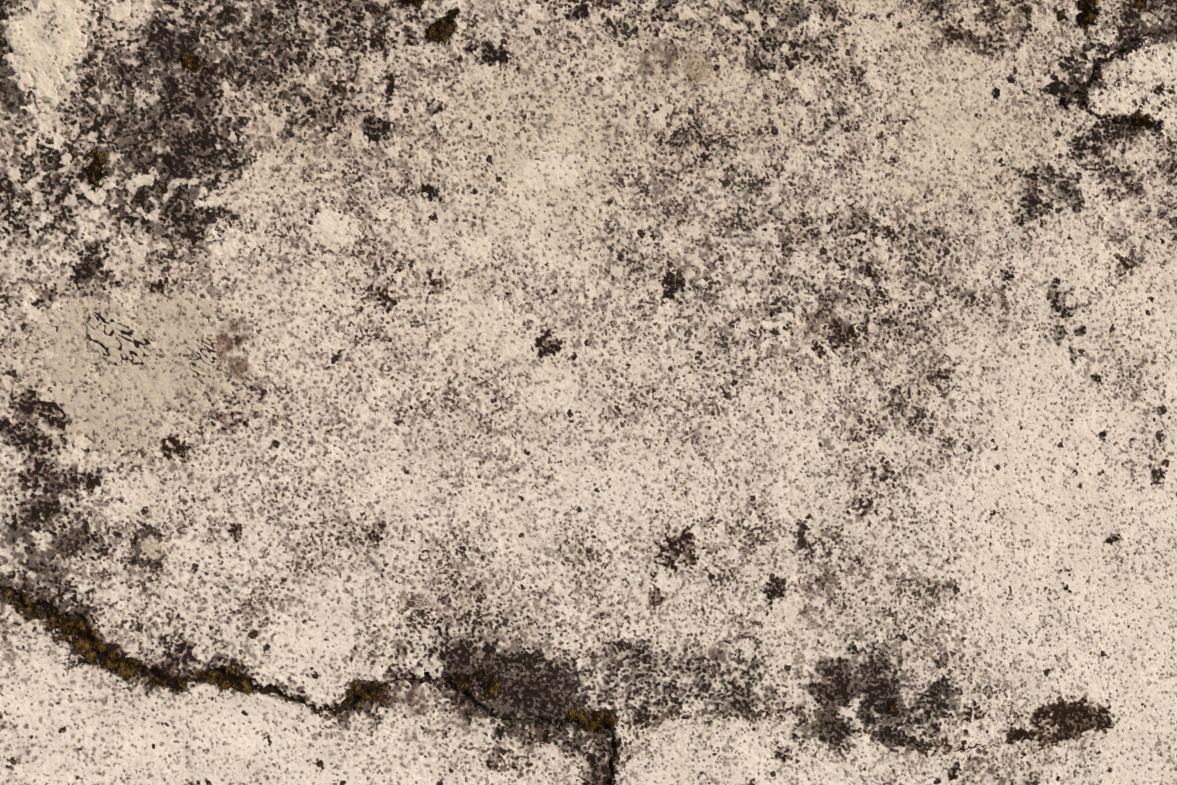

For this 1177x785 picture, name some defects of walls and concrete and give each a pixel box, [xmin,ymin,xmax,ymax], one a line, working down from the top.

water stain [634,0,688,23]
water stain [691,0,851,78]
crack [1055,19,1177,144]
water stain [0,0,454,295]
water stain [341,647,420,729]
crack [0,579,1008,784]
water stain [428,627,780,785]
mould [792,634,957,752]